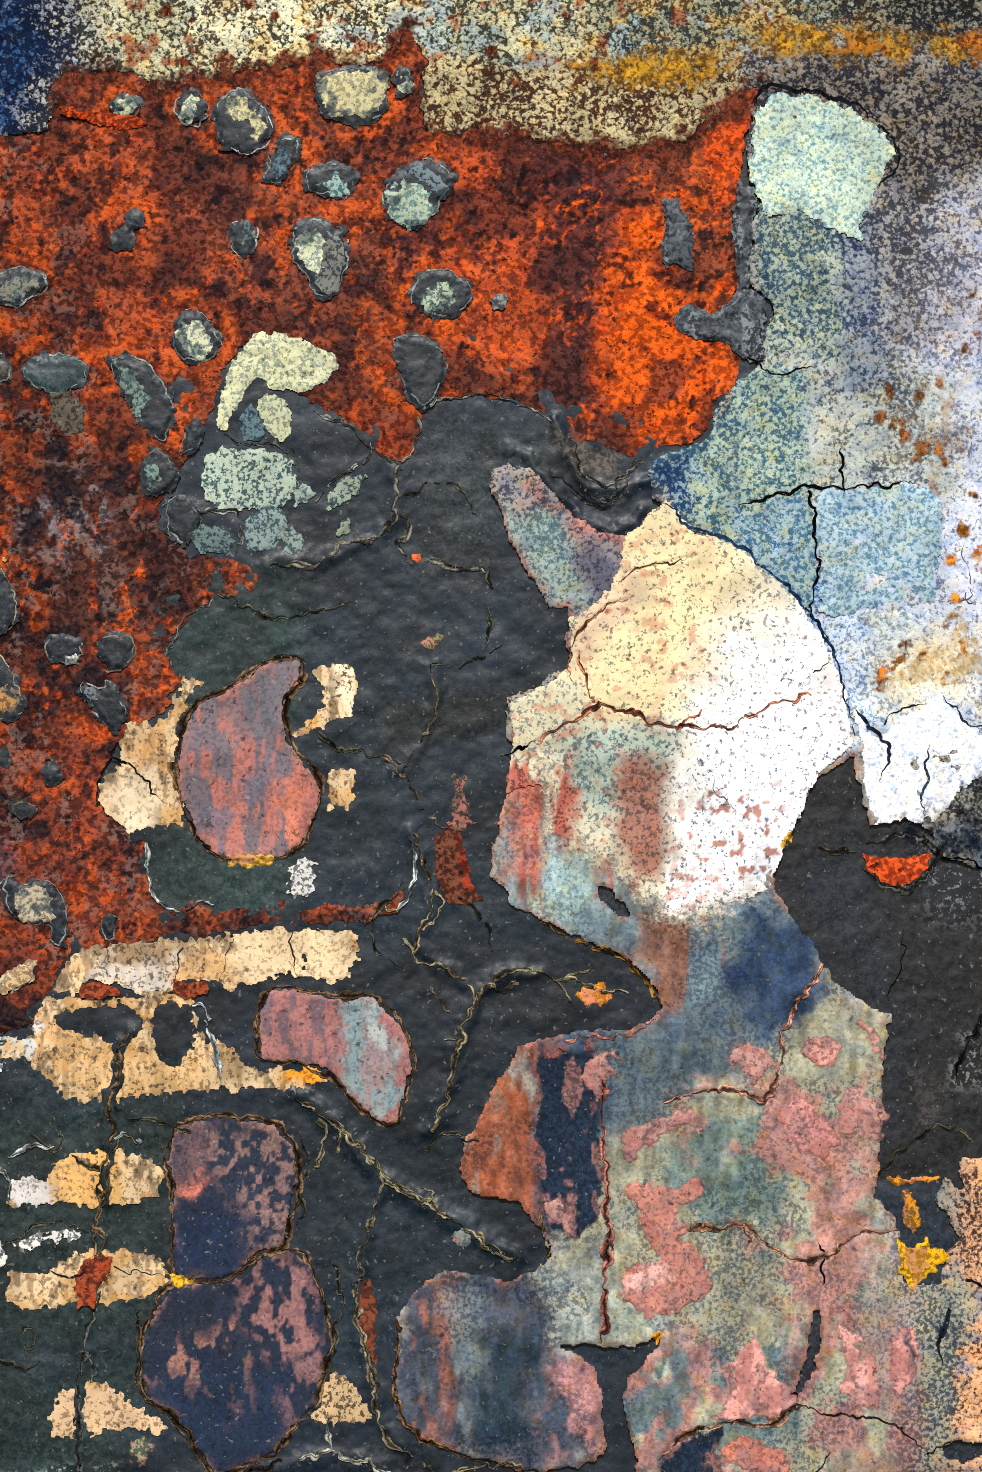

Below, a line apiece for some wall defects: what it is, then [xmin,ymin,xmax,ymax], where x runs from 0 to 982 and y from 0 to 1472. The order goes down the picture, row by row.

rust [875,378,950,467]
rust [0,0,768,1036]
rust [943,593,961,628]
rust [945,522,982,569]
crack [501,447,982,995]
crack [135,392,661,1472]
peeling [0,331,982,1472]
crack [664,962,824,1104]
crack [5,1032,191,1279]
crack [677,1221,899,1285]
crack [936,1278,982,1364]
crack [659,1403,963,1460]